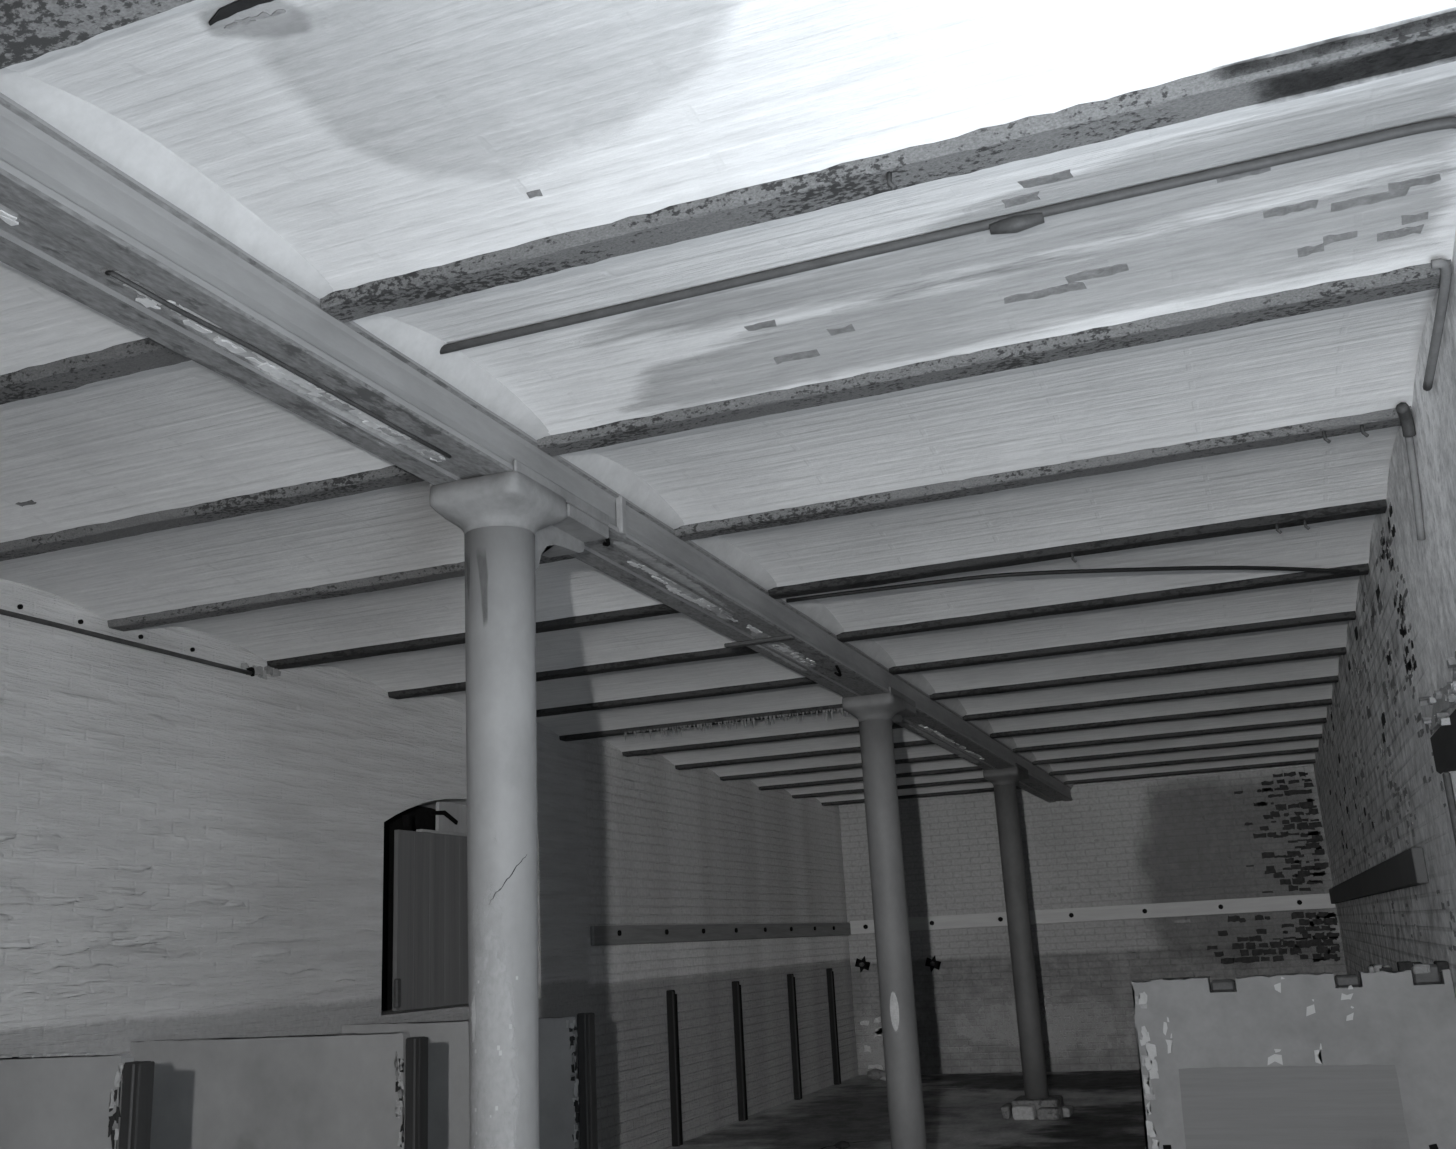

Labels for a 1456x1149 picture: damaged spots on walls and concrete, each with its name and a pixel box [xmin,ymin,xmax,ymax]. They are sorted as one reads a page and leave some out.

flaking render [209,0,286,29]
peeling [0,204,19,226]
peeling [1234,502,1456,893]
peeling [1207,912,1360,1021]
flaking render [1411,964,1441,985]
peeling [1268,1049,1283,1065]
peeling [1314,1043,1322,1064]